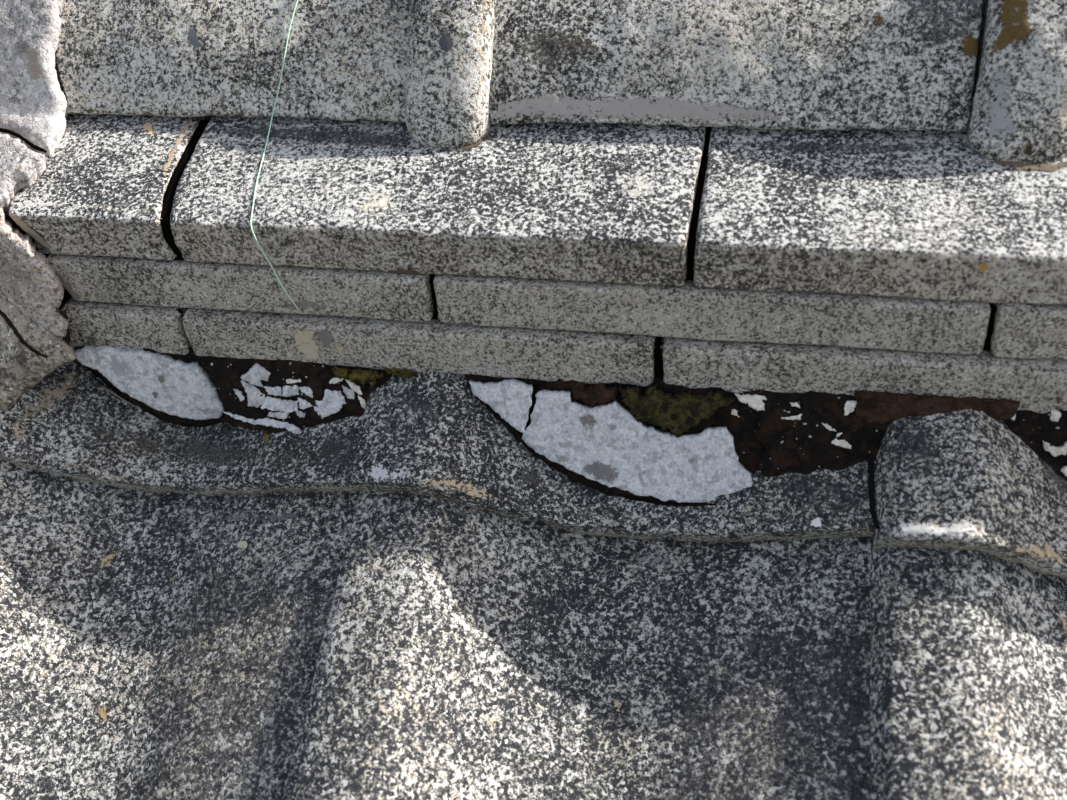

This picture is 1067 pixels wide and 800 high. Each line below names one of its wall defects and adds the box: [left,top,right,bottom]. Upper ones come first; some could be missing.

crack [0,128,47,153]
crack [160,119,209,260]
flaking render [221,363,366,434]
flaking render [731,393,767,417]
flaking render [781,402,802,420]
flaking render [844,400,857,416]
flaking render [1050,410,1061,422]
flaking render [822,423,852,449]
flaking render [1043,441,1067,476]